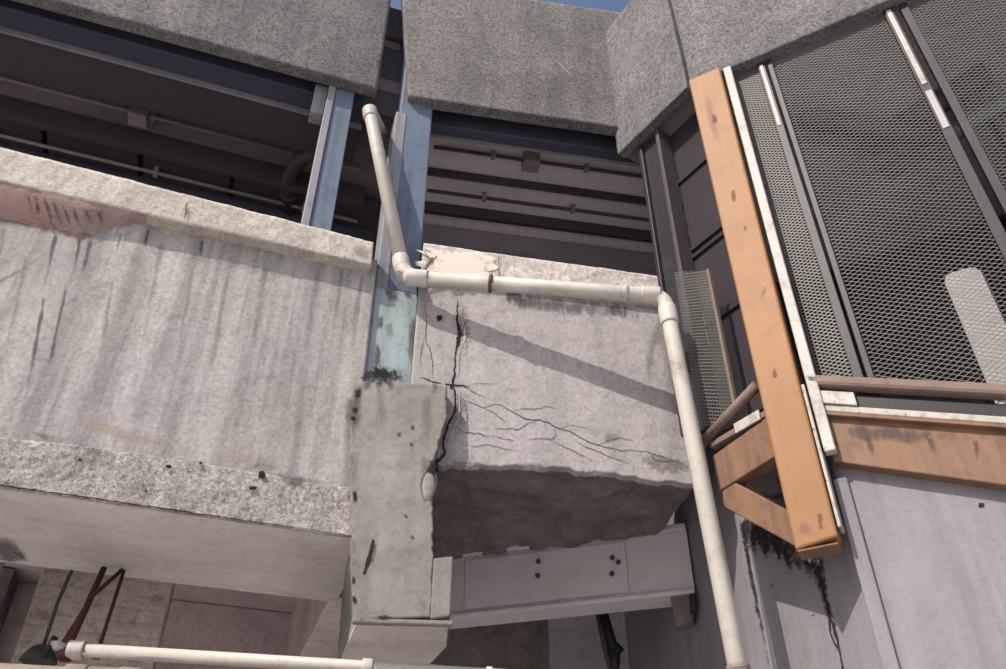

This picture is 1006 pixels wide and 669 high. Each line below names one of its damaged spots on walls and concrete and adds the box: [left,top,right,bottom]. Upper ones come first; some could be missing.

damp [348,365,403,423]
crack [420,301,687,473]
damp [740,520,843,669]